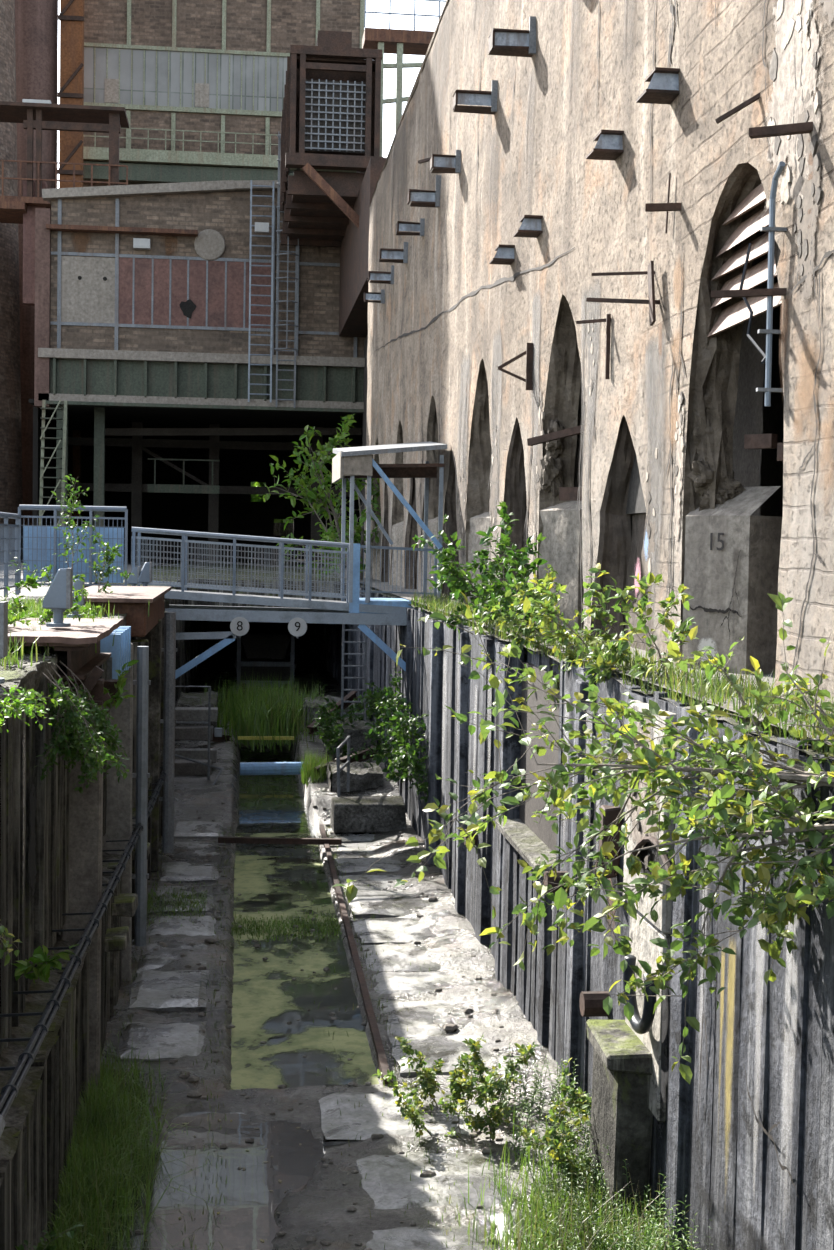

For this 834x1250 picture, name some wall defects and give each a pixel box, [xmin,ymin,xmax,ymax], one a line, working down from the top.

crack [445,38,482,263]
crack [374,247,575,352]
spalling [762,0,834,302]
crack [791,250,834,671]